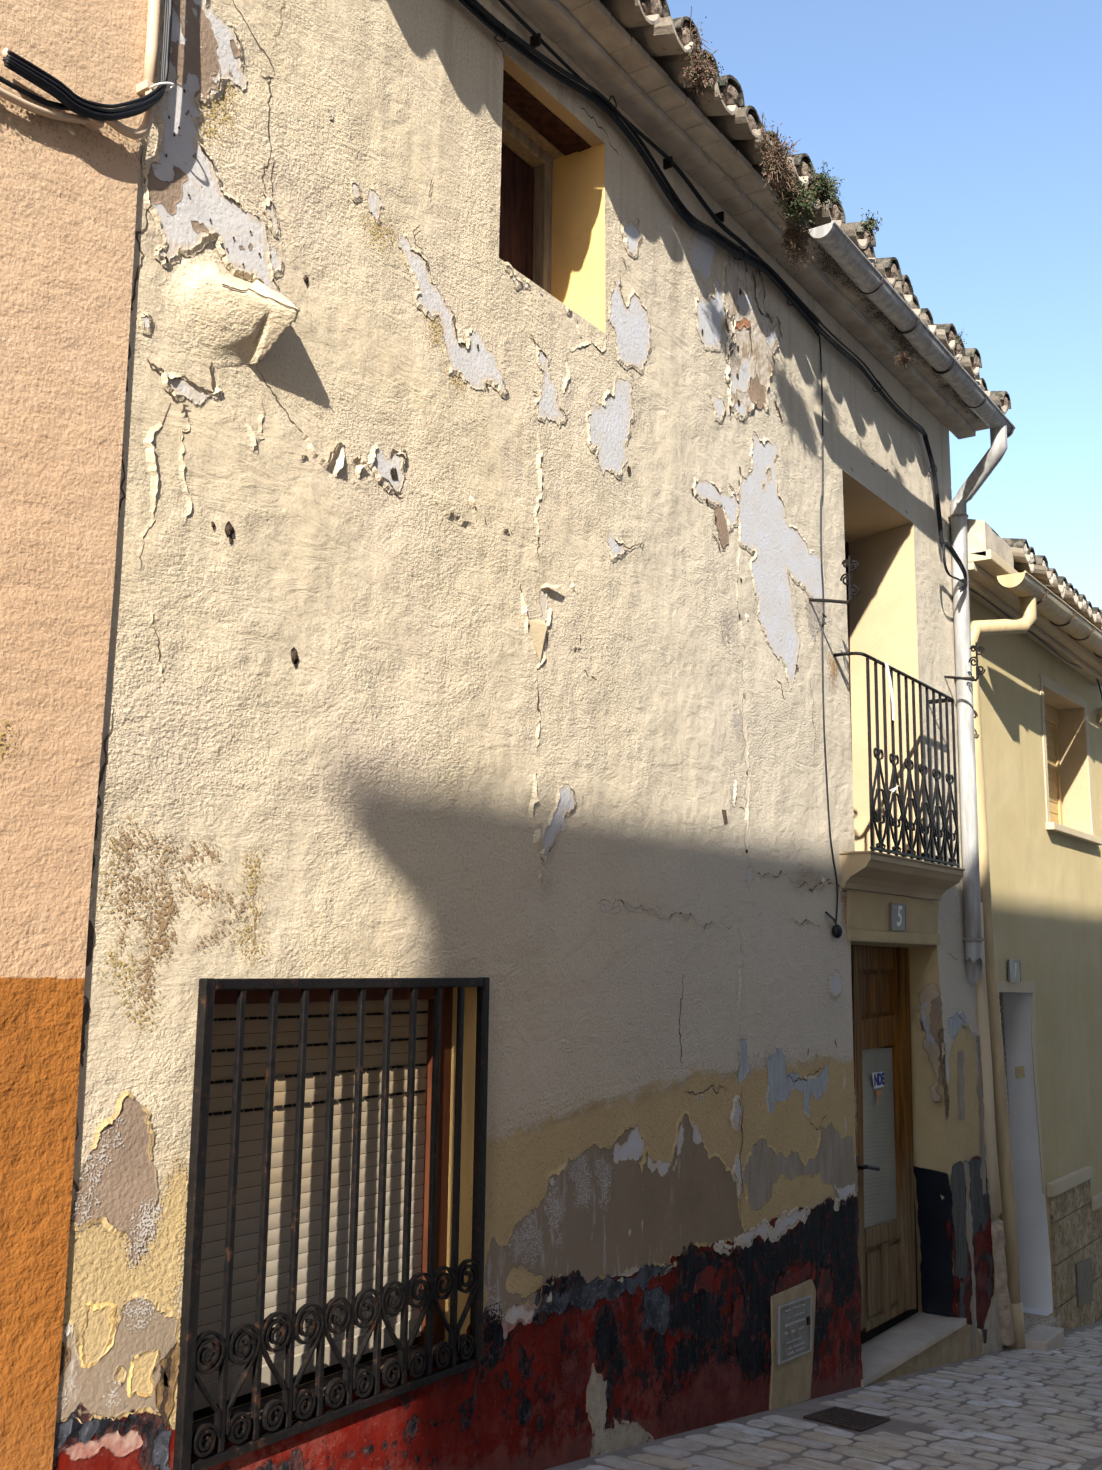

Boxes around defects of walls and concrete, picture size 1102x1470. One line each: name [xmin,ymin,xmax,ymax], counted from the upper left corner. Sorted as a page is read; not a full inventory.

peeling [142,0,284,293]
crack [233,1,285,198]
crack [126,209,148,392]
crack [245,398,367,479]
peeling [397,225,509,399]
peeling [528,215,652,480]
peeling [689,220,827,691]
crack [80,709,114,1067]
crack [69,1179,79,1232]
peeling [70,1090,168,1268]
peeling [327,1035,859,1470]
peeling [52,1291,180,1470]